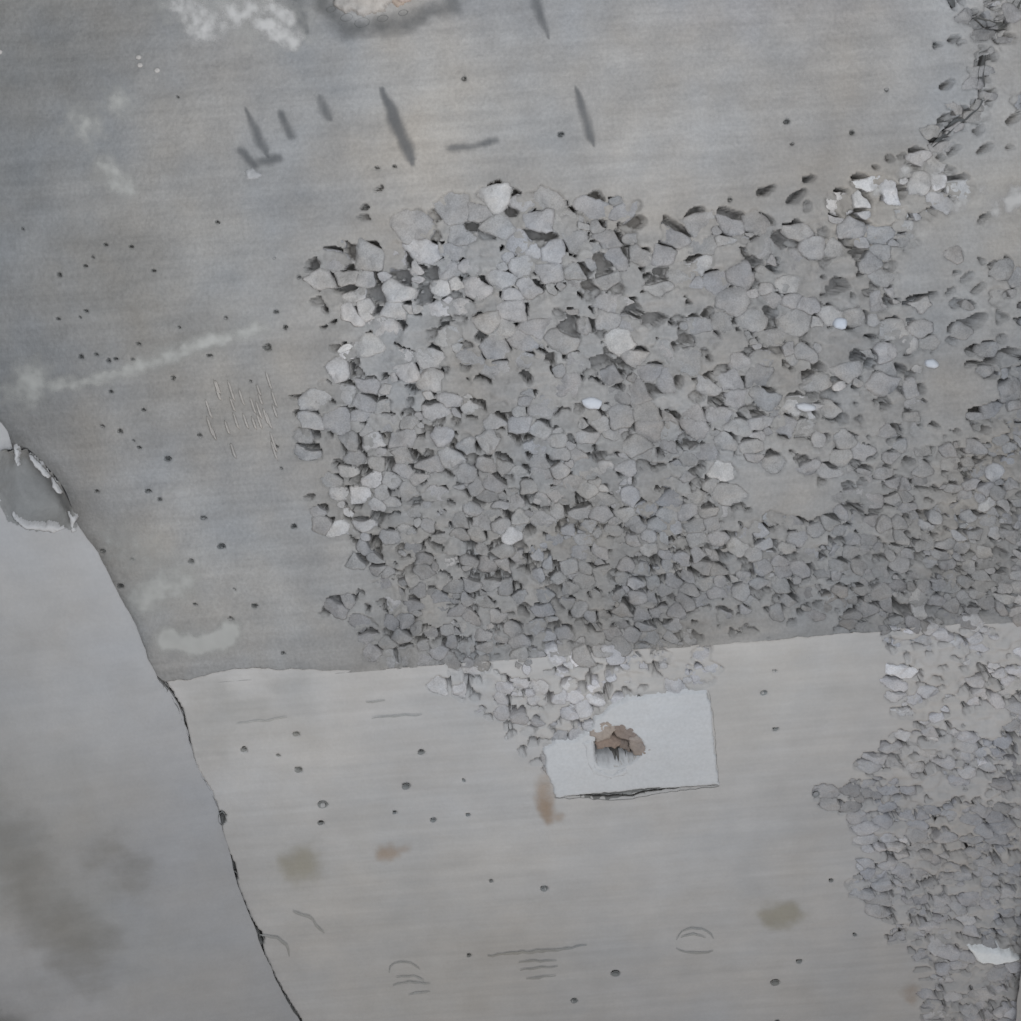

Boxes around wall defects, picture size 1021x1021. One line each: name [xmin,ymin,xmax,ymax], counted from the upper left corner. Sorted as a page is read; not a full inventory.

flaking render [919,65,998,153]
flaking render [878,179,901,206]
flaking render [302,182,625,436]
flaking render [591,210,813,337]
flaking render [795,215,867,260]
flaking render [582,328,677,443]
flaking render [678,369,747,441]
flaking render [782,359,902,417]
spalling [0,444,79,533]
flaking render [493,641,633,741]
flaking render [879,663,939,716]
spalling [967,939,1021,979]